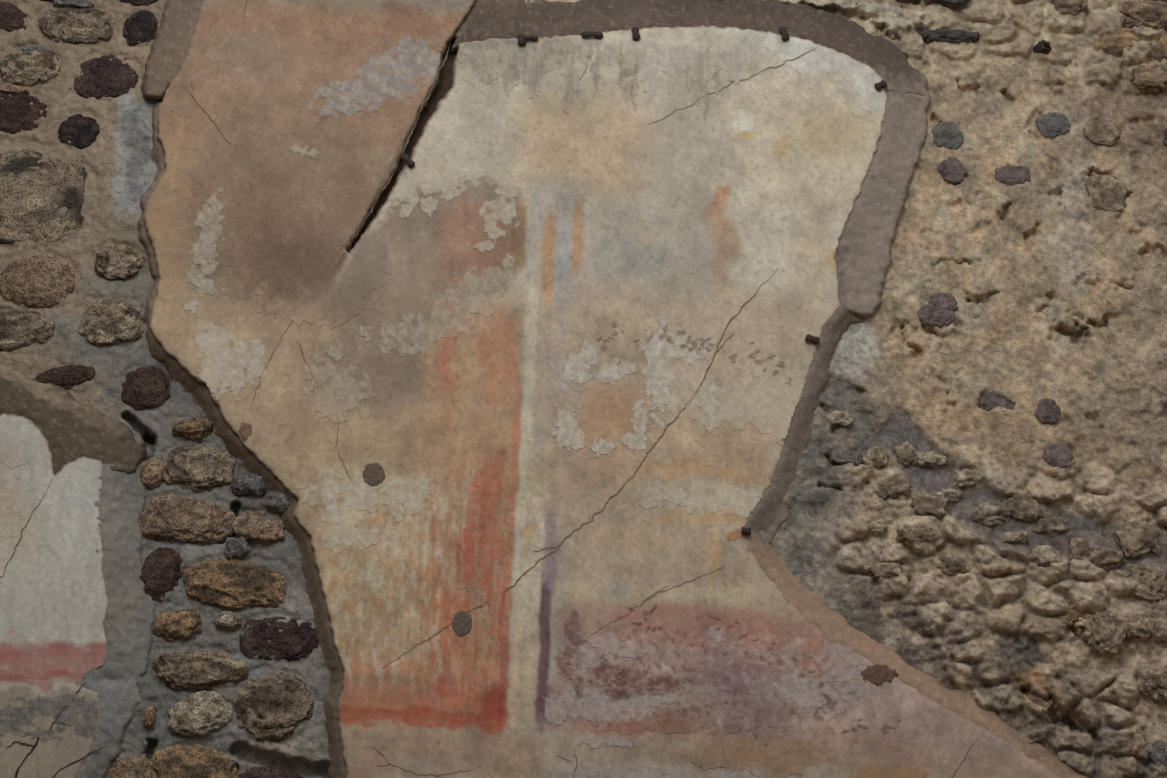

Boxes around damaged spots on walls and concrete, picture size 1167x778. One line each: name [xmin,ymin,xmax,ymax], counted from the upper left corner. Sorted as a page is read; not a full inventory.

crack [333,40,457,269]
crack [647,45,820,125]
peeling [359,185,522,356]
crack [0,477,53,578]
spalling [0,0,440,778]
crack [383,268,779,668]
spalling [542,0,1167,778]